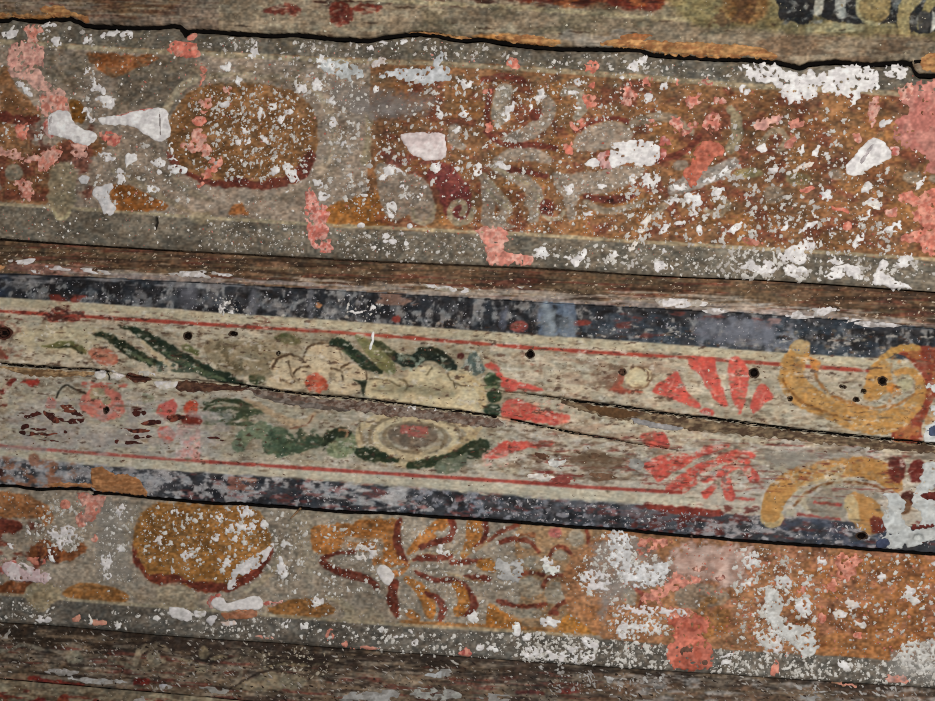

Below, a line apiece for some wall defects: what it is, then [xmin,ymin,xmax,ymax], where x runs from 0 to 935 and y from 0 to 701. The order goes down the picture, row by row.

crack [0,17,935,78]
peeling [0,5,935,291]
crack [1,363,110,380]
peeling [115,408,186,445]
crack [239,383,676,450]
crack [508,392,935,445]
peeling [924,405,935,443]
peeling [527,452,575,483]
crack [0,484,935,556]
peeling [0,461,935,701]